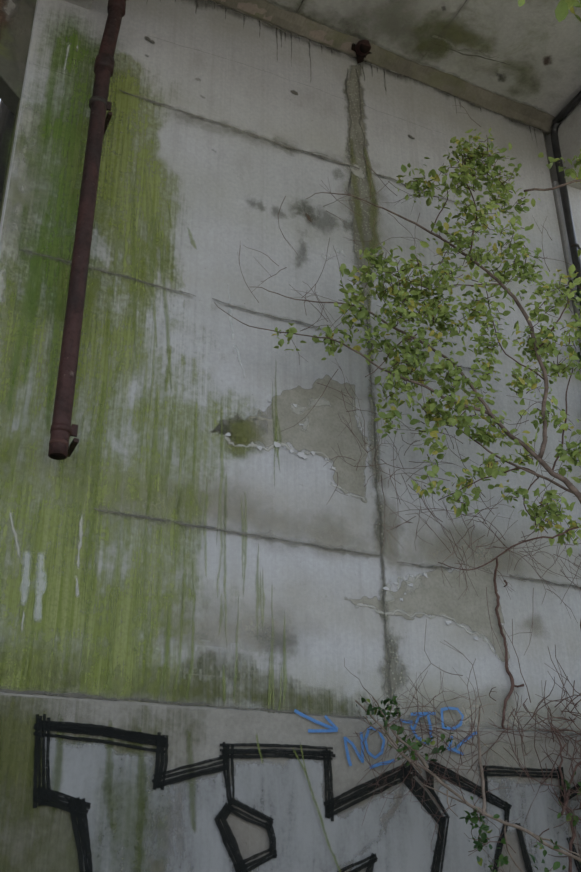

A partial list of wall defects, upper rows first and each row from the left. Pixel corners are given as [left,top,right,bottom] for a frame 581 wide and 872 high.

leakage [343,56,405,329]
peeling [212,375,370,503]
leakage [368,341,405,706]
peeling [345,567,510,662]
leakage [106,653,354,716]